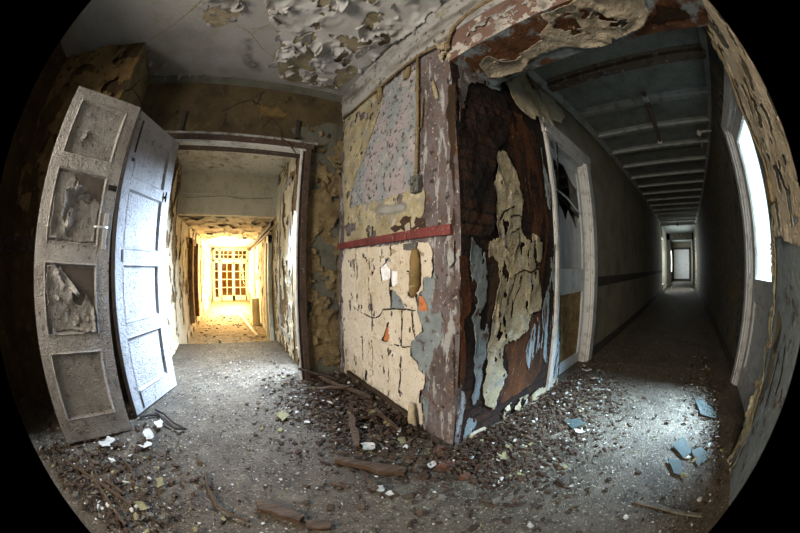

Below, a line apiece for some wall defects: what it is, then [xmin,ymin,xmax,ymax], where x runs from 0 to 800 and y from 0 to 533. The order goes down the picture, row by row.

peeling [58,267,79,296]
peeling [17,44,140,216]
peeling [196,0,246,28]
peeling [165,65,444,427]
peeling [264,0,442,90]
peeling [458,0,651,420]
peeling [702,0,800,507]
peeling [463,418,477,440]